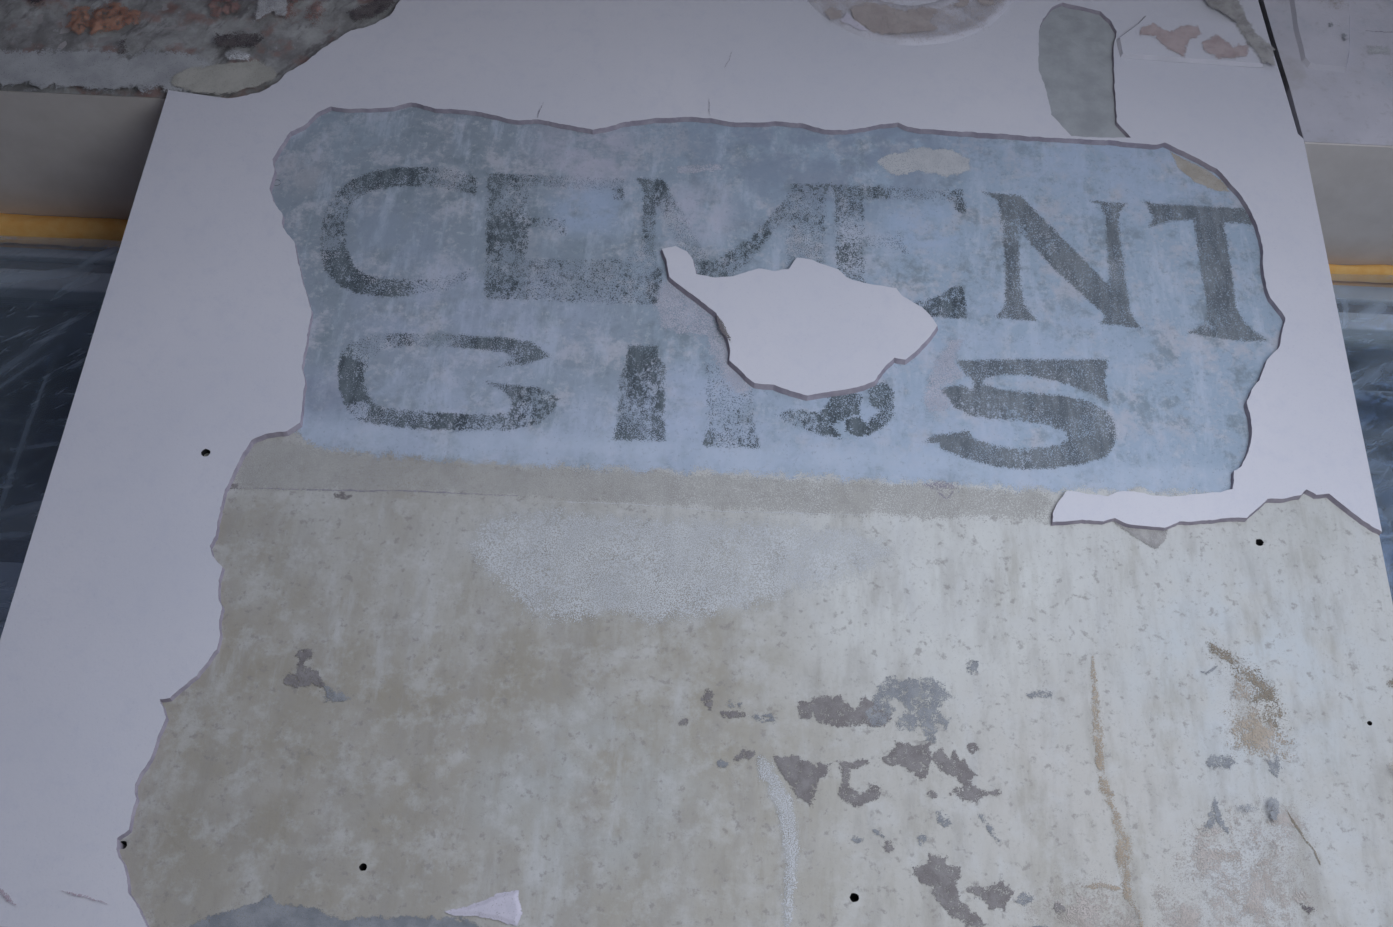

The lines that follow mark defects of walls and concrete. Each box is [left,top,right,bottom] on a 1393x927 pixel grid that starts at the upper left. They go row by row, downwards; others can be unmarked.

flaking render [0,0,400,98]
flaking render [269,0,1285,489]
flaking render [116,242,1393,927]